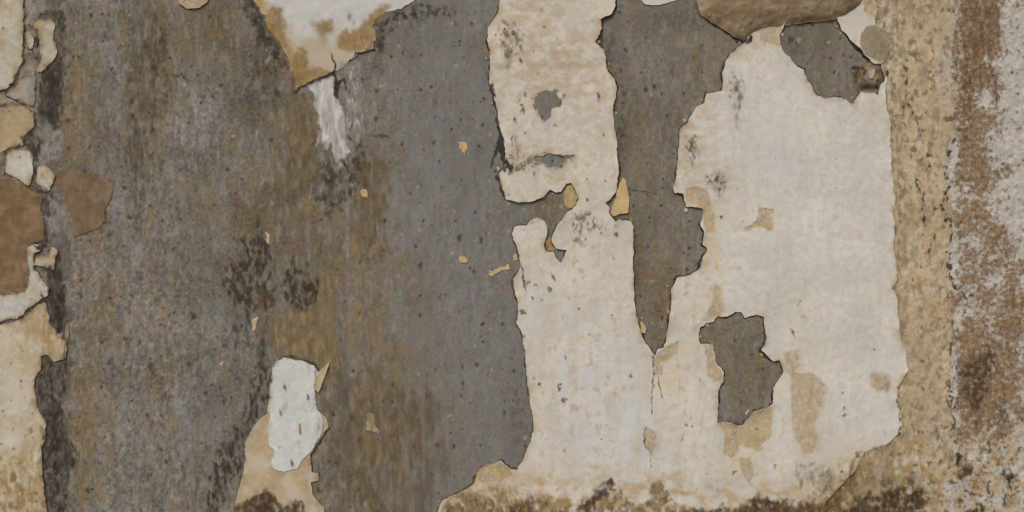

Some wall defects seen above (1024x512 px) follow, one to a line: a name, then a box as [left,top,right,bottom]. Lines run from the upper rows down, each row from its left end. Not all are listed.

leakage [207,237,347,512]
peeling [0,0,588,512]
peeling [595,0,748,374]
leakage [446,445,929,512]
peeling [699,300,797,481]
peeling [763,0,961,512]